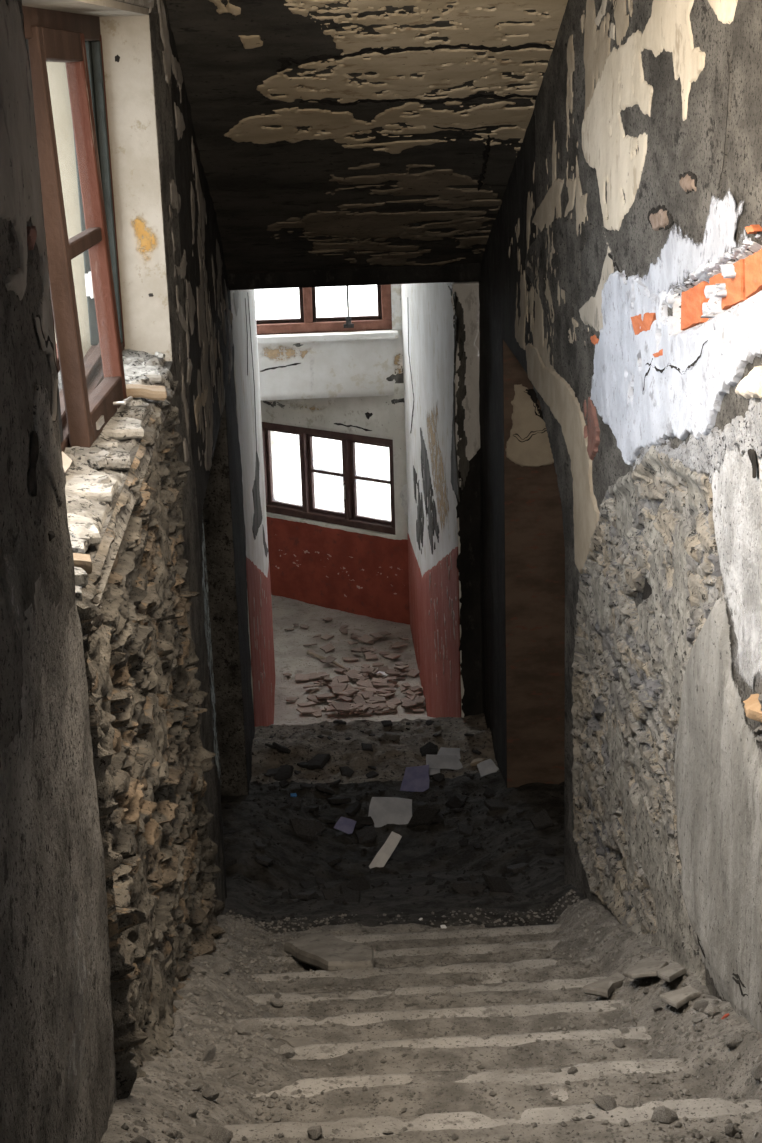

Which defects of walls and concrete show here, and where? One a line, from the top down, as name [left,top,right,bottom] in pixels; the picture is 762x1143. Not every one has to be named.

peeling [0,0,56,374]
spalling [69,0,241,1100]
spalling [224,0,762,985]